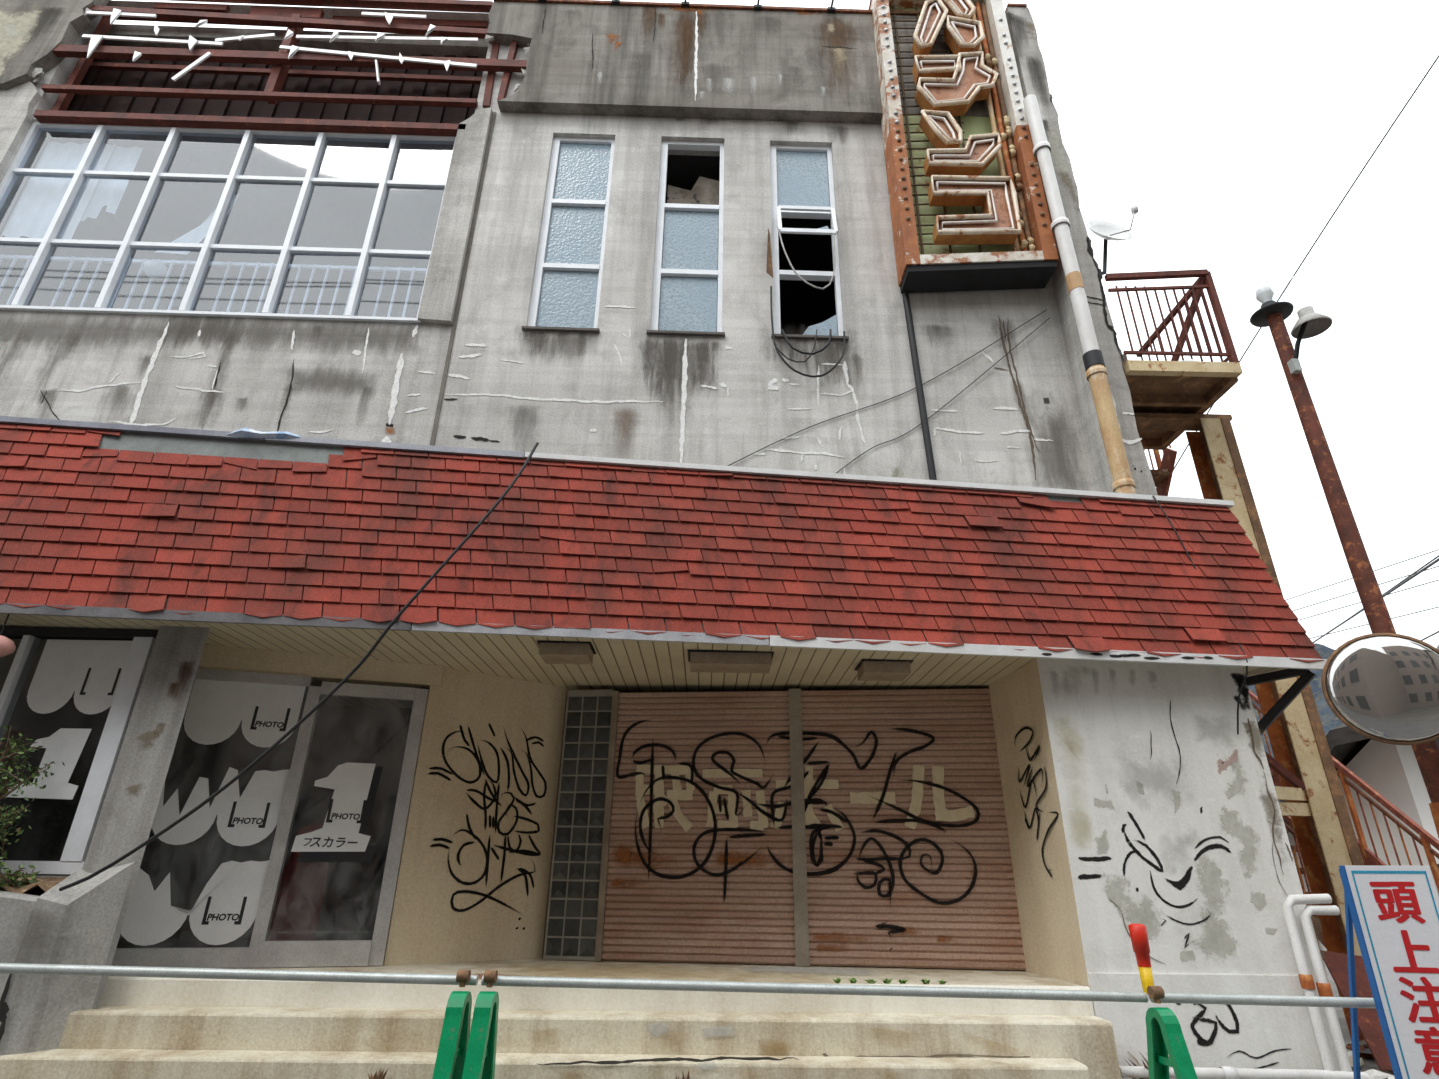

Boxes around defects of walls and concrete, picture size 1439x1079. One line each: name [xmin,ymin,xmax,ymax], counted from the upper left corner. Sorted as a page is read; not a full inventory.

leakage [828,24,846,62]
leakage [0,320,408,362]
leakage [287,373,364,395]
leakage [646,343,716,383]
corrosion [1220,418,1284,598]
leakage [1231,673,1261,749]
corrosion [1297,676,1365,866]
leakage [1262,796,1281,838]
crack [0,974,12,1041]